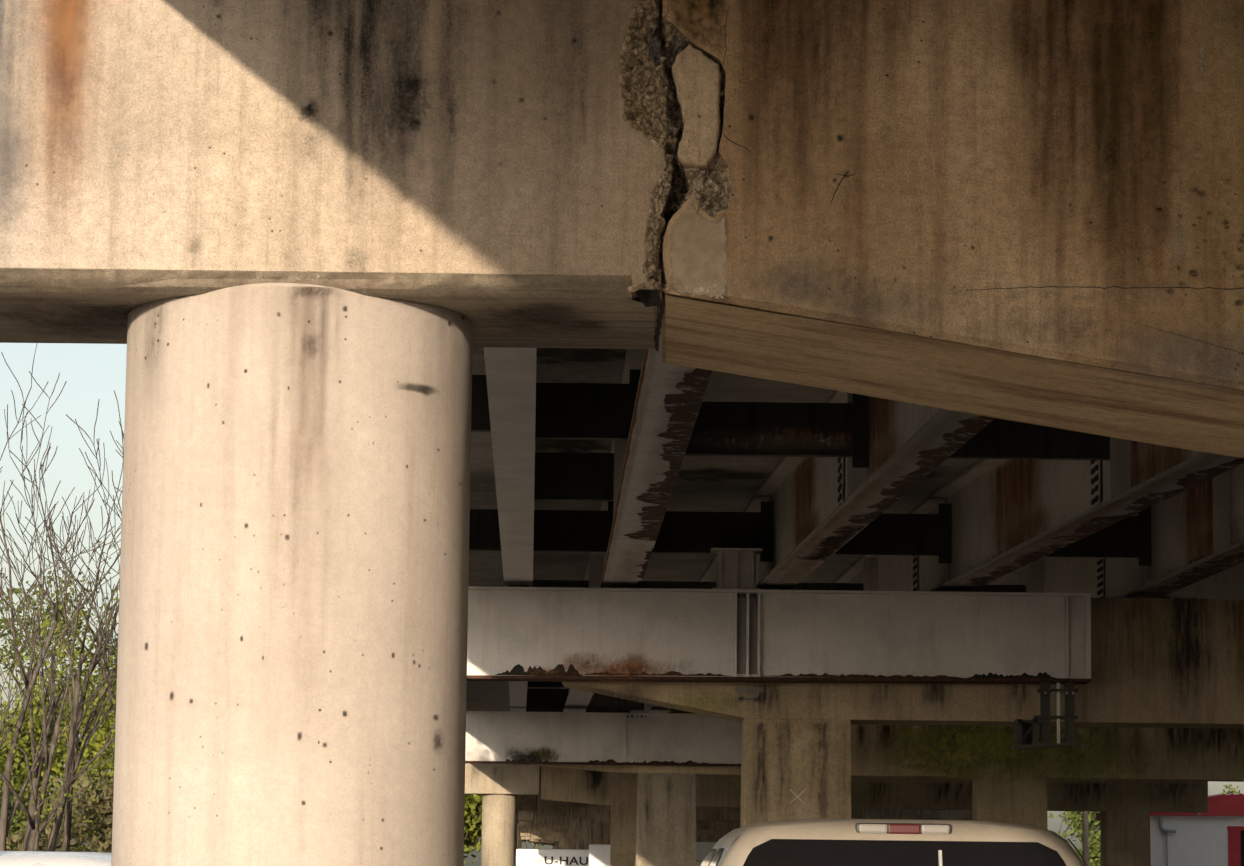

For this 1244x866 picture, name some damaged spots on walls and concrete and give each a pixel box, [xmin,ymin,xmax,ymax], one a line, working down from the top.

leakage [344,0,374,83]
spalling [619,5,732,218]
leakage [1046,0,1075,160]
crack [628,0,749,351]
spalling [634,275,659,307]
crack [979,284,1244,292]
rust [496,657,726,676]